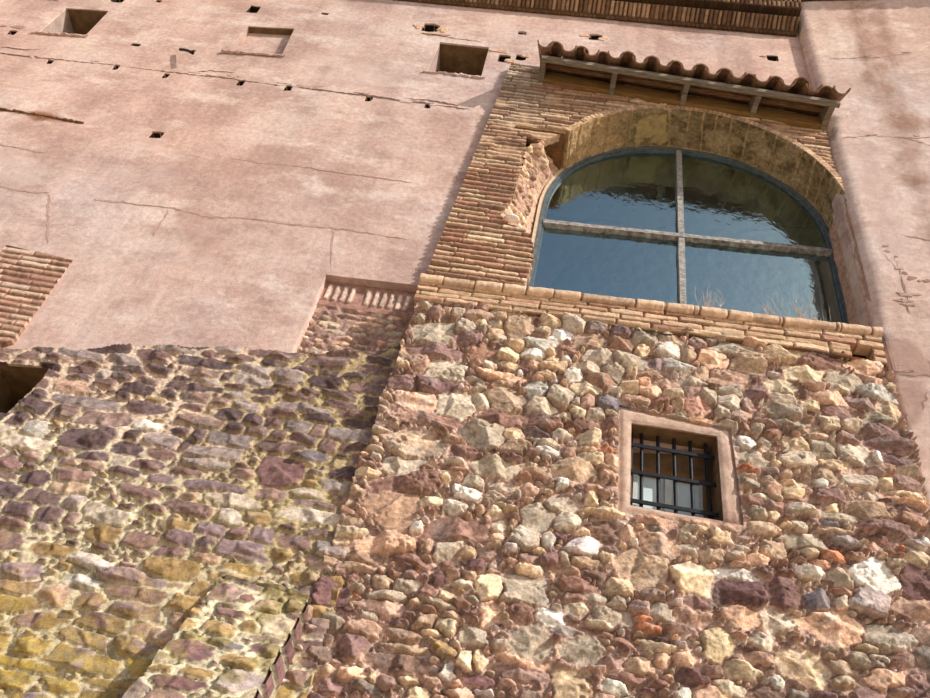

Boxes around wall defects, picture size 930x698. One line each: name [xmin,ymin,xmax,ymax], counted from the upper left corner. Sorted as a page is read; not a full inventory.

crack [0,107,84,124]
crack [842,134,930,146]
crack [0,186,51,243]
crack [95,199,408,263]
crack [887,257,921,311]
crack [892,360,930,409]